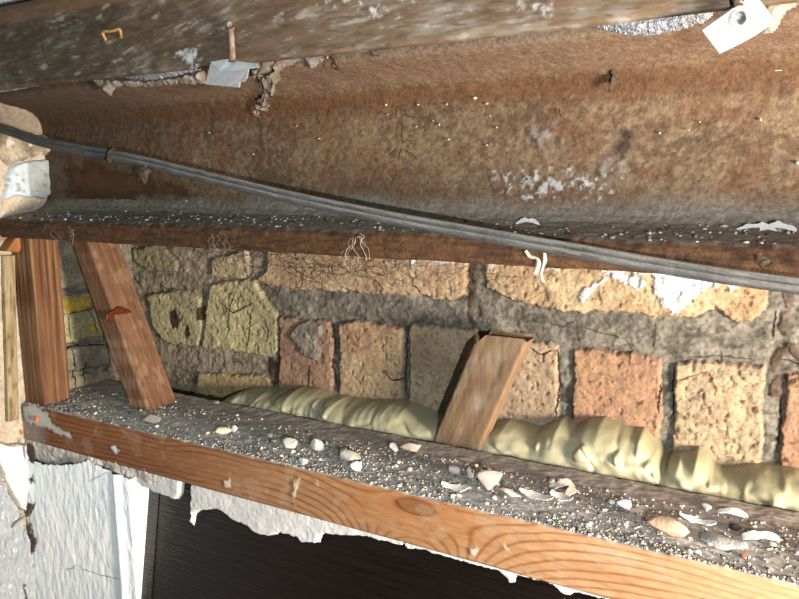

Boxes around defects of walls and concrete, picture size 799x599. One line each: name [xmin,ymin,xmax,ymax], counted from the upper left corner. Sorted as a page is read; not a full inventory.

peeling [0,133,51,200]
rust [66,160,187,200]
rust [618,130,631,161]
leakage [578,270,717,314]
crack [220,292,280,386]
crack [775,395,783,452]
peeling [0,431,156,528]